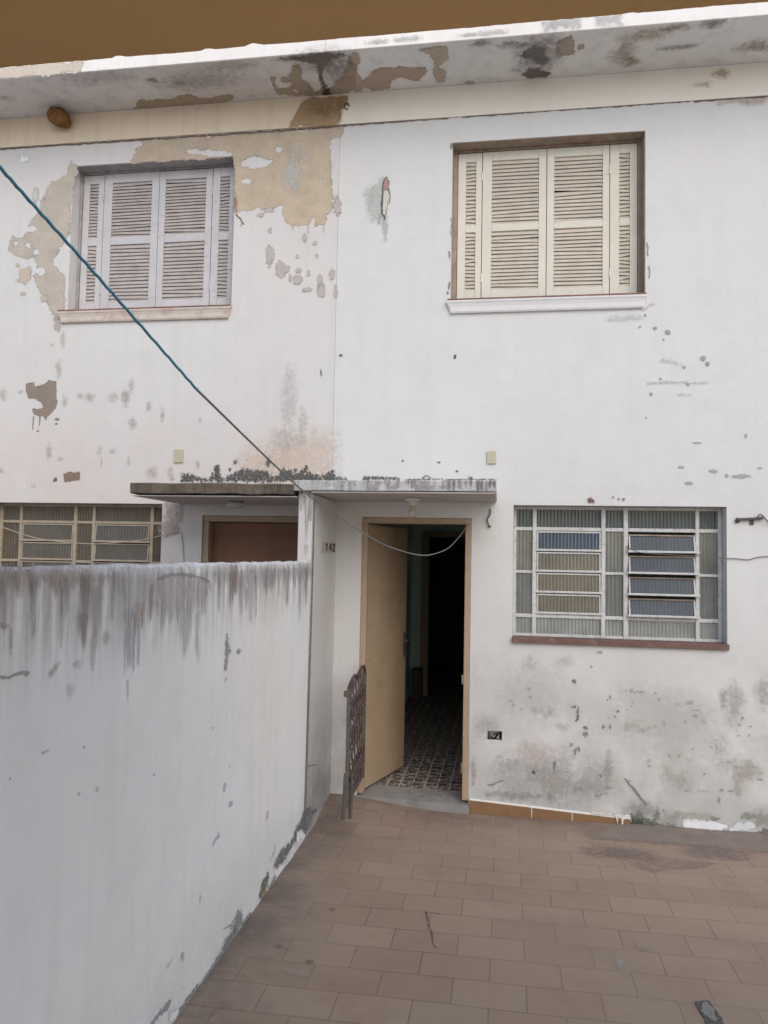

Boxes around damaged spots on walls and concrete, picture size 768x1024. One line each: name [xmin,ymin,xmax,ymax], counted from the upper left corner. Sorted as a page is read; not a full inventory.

leakage [278,52,349,128]
peeling [270,36,449,96]
leakage [504,38,555,79]
peeling [131,127,344,258]
peeling [8,161,79,332]
flaking render [26,380,59,432]
leakage [0,561,310,670]
leakage [224,634,242,681]
leakage [630,805,725,831]
peeling [682,816,756,831]
leakage [741,812,768,833]
flaking render [259,808,317,900]